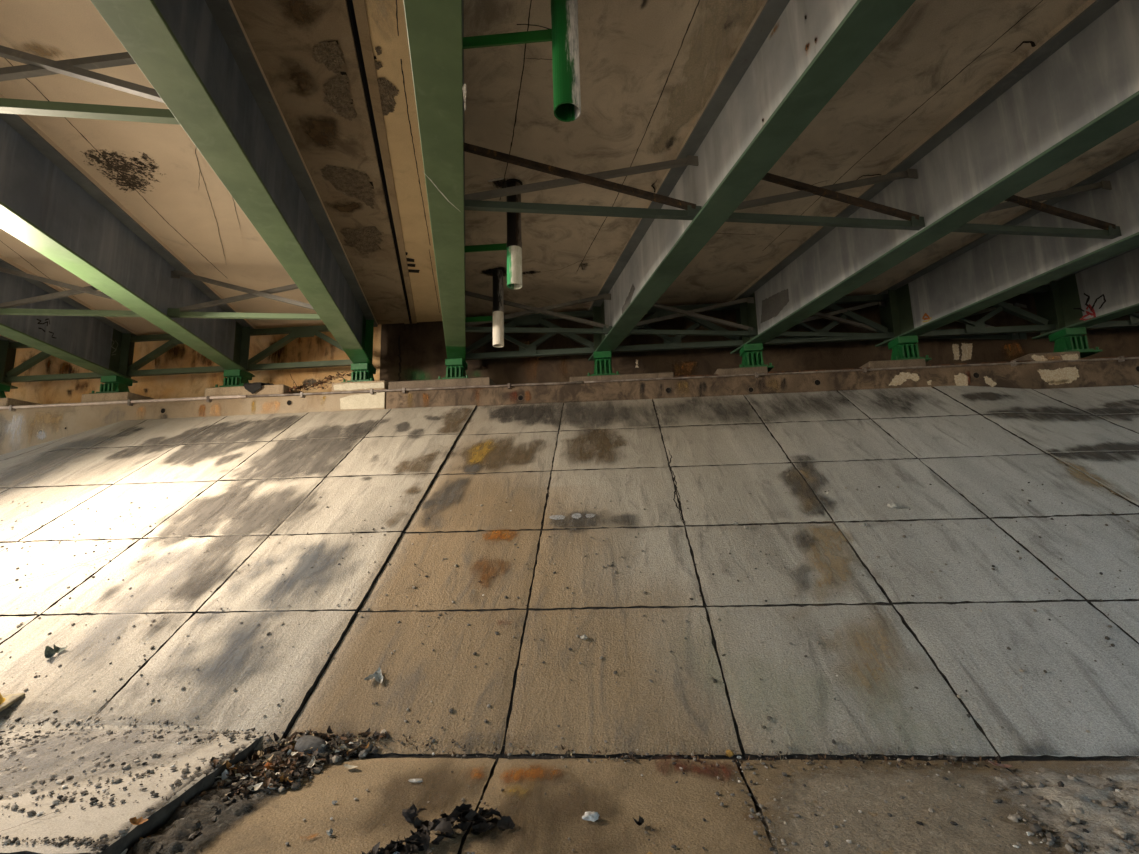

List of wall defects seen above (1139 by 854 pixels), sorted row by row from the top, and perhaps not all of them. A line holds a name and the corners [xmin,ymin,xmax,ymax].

spalling [312,40,358,121]
crack [195,147,240,256]
spalling [320,165,375,209]
spalling [340,226,383,255]
peeling [952,343,973,386]
peeling [1004,343,1079,385]
damp [485,378,849,462]
damp [0,408,471,658]
damp [550,512,634,531]
damp [783,456,851,588]
damp [183,544,346,701]